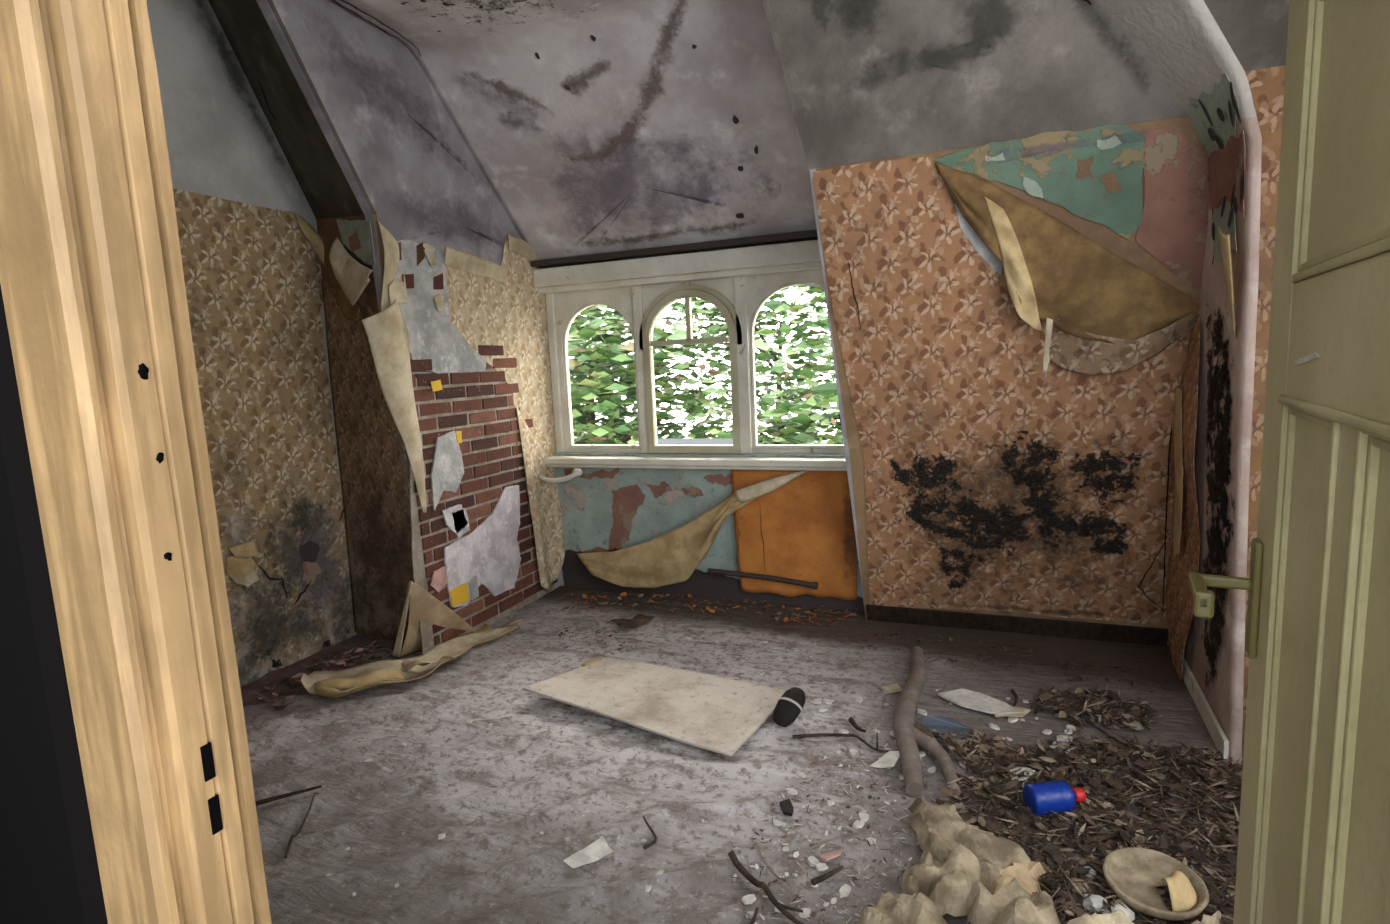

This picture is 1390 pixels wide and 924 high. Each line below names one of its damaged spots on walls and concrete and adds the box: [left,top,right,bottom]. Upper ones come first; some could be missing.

peeling [336,219,376,265]
leakage [474,75,545,108]
leakage [560,0,715,244]
peeling [933,74,1245,339]
leakage [251,499,337,668]
flaking render [389,240,558,655]
peeling [564,468,732,552]
leakage [890,430,1141,604]
mould [1201,302,1235,688]